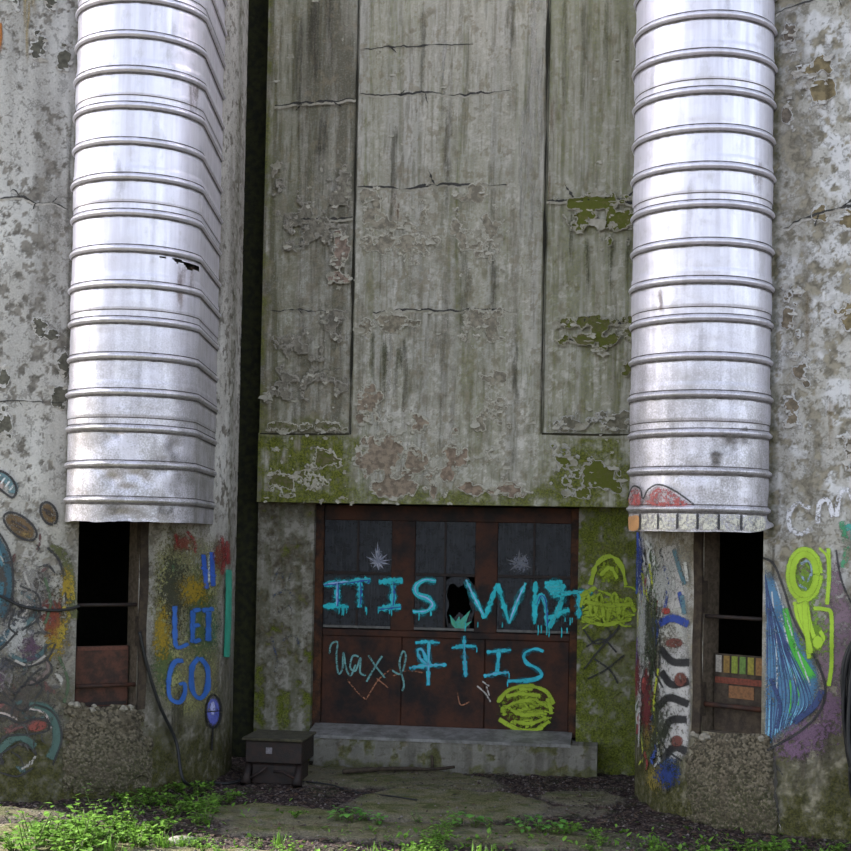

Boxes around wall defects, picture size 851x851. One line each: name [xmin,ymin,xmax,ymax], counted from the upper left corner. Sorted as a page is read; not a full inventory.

crack [365,44,472,53]
crack [274,90,512,110]
peeling [791,52,837,111]
crack [357,172,507,192]
peeling [270,146,515,290]
peeling [553,188,633,251]
peeling [822,299,851,333]
spalling [552,314,632,400]
peeling [0,363,18,440]
peeling [258,304,534,505]
spalling [548,407,630,454]
peeling [549,443,628,500]